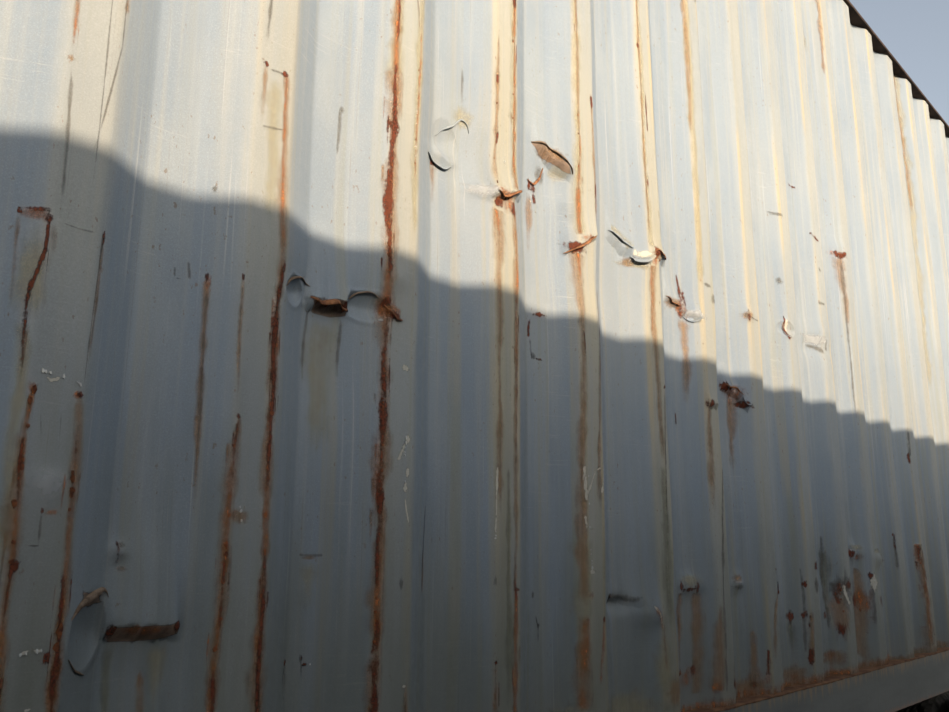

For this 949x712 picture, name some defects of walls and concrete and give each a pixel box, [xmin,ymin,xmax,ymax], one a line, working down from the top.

corrosion [0,384,37,658]
corrosion [17,207,53,363]
corrosion [43,440,80,712]
corrosion [207,540,229,712]
corrosion [253,263,286,712]
corrosion [368,0,401,712]
corrosion [573,253,587,595]
corrosion [784,538,871,679]